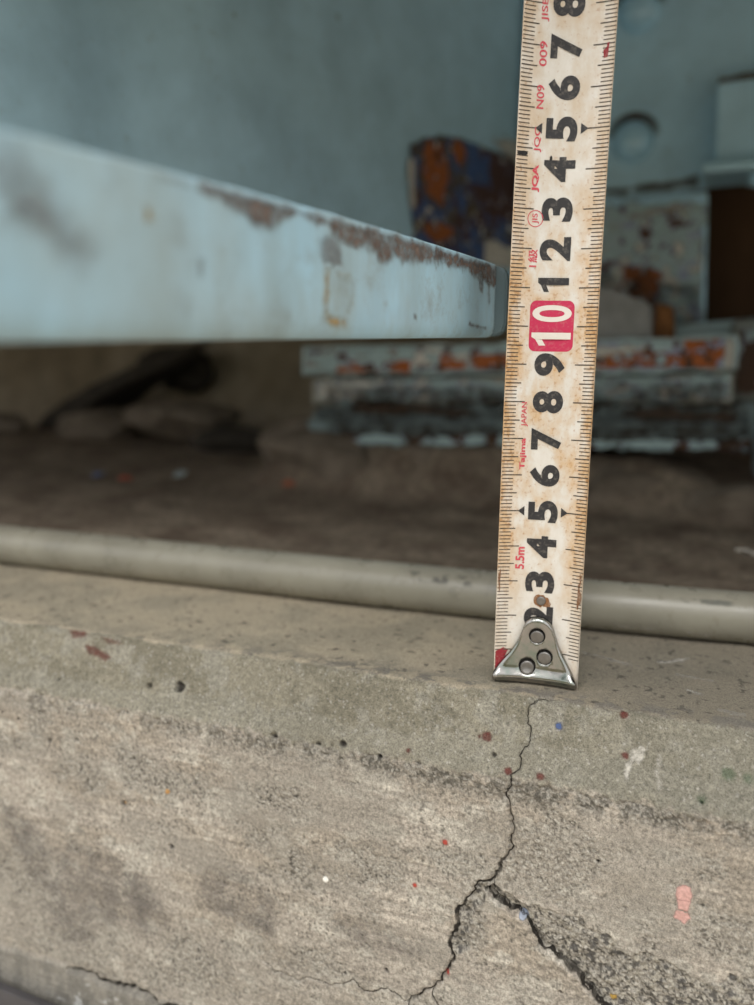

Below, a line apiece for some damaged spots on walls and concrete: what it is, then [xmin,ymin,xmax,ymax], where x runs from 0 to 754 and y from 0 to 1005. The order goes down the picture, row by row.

crack [71,967,179,1005]
crack [268,699,548,1005]